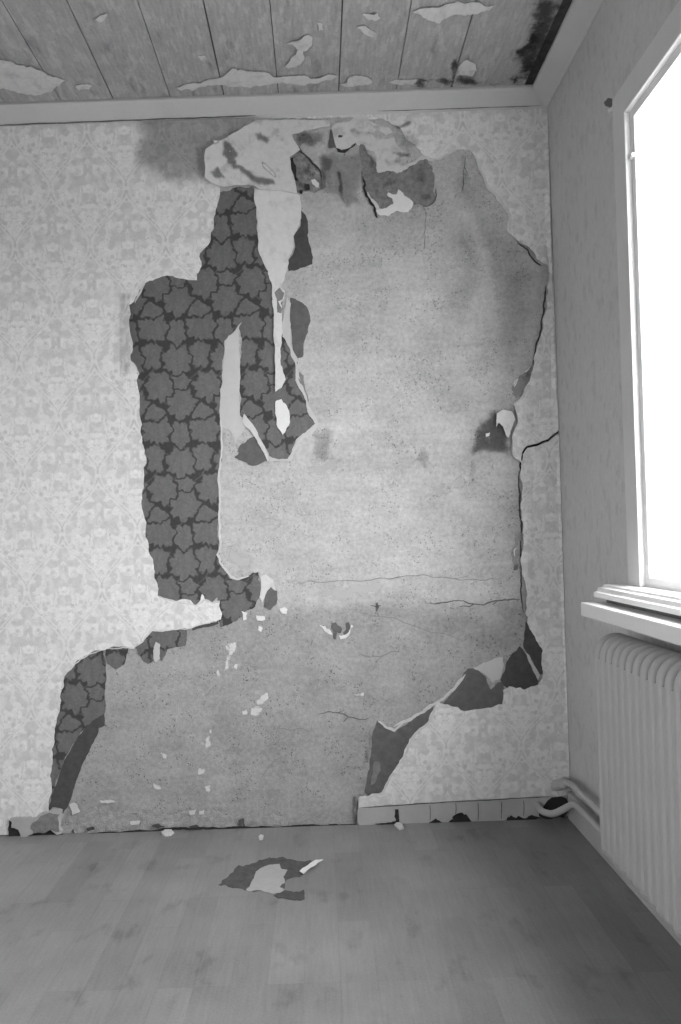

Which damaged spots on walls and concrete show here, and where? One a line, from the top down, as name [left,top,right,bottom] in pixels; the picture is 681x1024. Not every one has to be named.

peeling [0,60,92,96]
peeling [177,22,373,91]
peeling [357,13,380,38]
damp [415,60,478,87]
peeling [413,1,493,24]
peeling [457,60,477,76]
damp [514,1,564,81]
crack [519,431,558,471]
peeling [61,118,548,834]
crack [295,574,519,607]